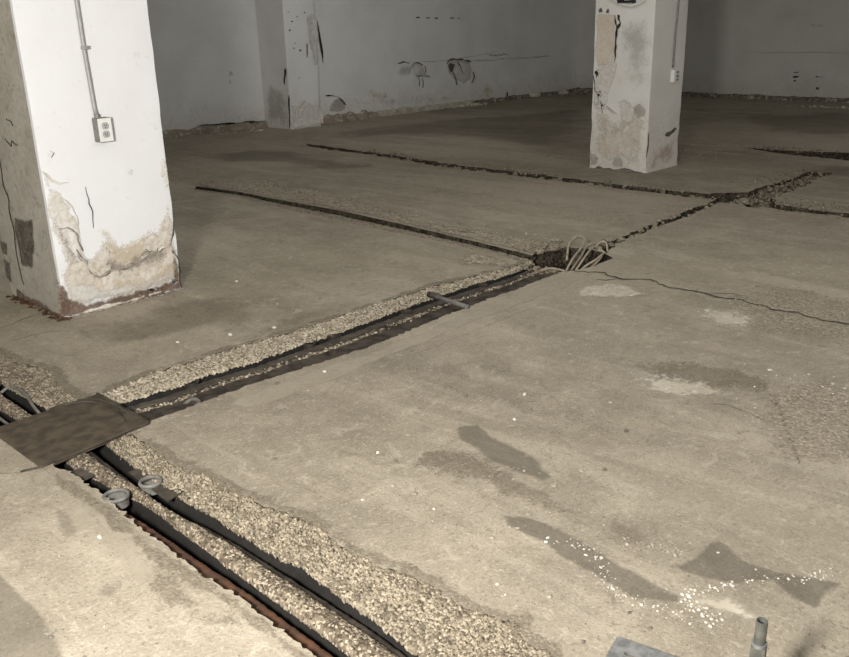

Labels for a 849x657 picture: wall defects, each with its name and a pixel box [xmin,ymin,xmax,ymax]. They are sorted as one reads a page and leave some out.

peeling [589,8,644,167]
flaking render [0,0,177,314]
crack [0,163,24,285]
rust [16,250,181,317]
crack [567,270,849,324]